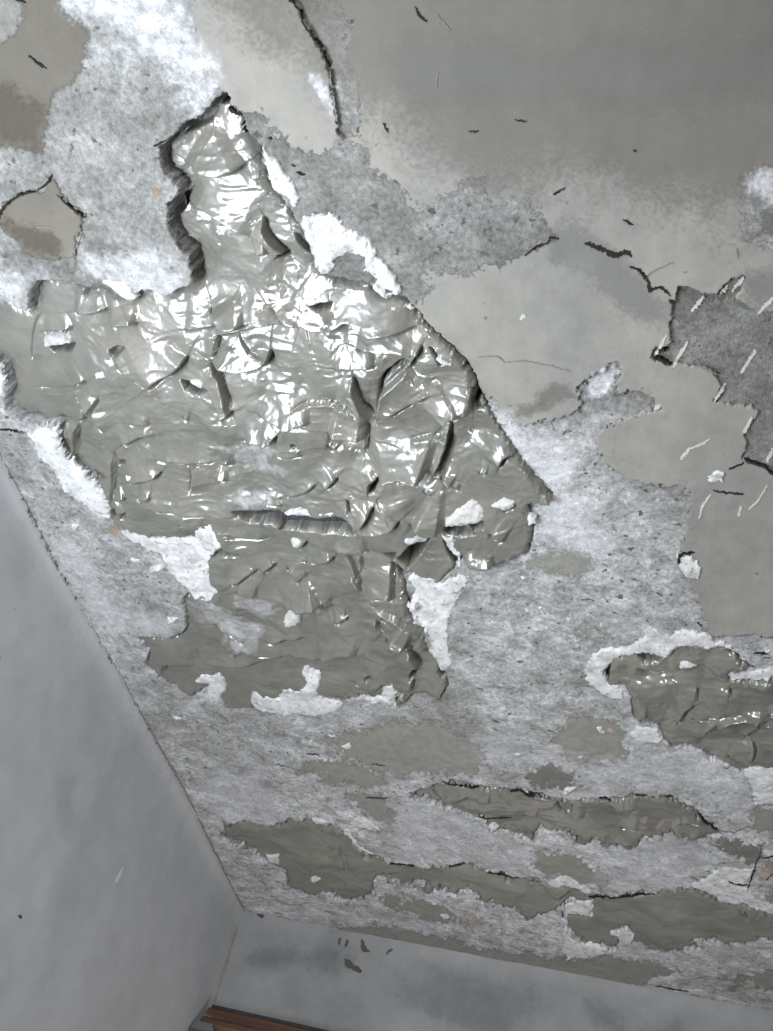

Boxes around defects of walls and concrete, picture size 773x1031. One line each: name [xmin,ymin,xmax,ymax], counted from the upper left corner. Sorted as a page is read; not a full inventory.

leakage [69,0,218,112]
crack [288,0,340,128]
spalling [0,0,556,311]
crack [525,236,559,256]
crack [584,219,675,304]
spalling [736,172,773,249]
spalling [652,275,773,470]
spalling [0,351,773,1011]
crack [442,780,480,789]
crack [479,813,512,821]
crack [510,788,542,798]
crack [599,793,673,801]